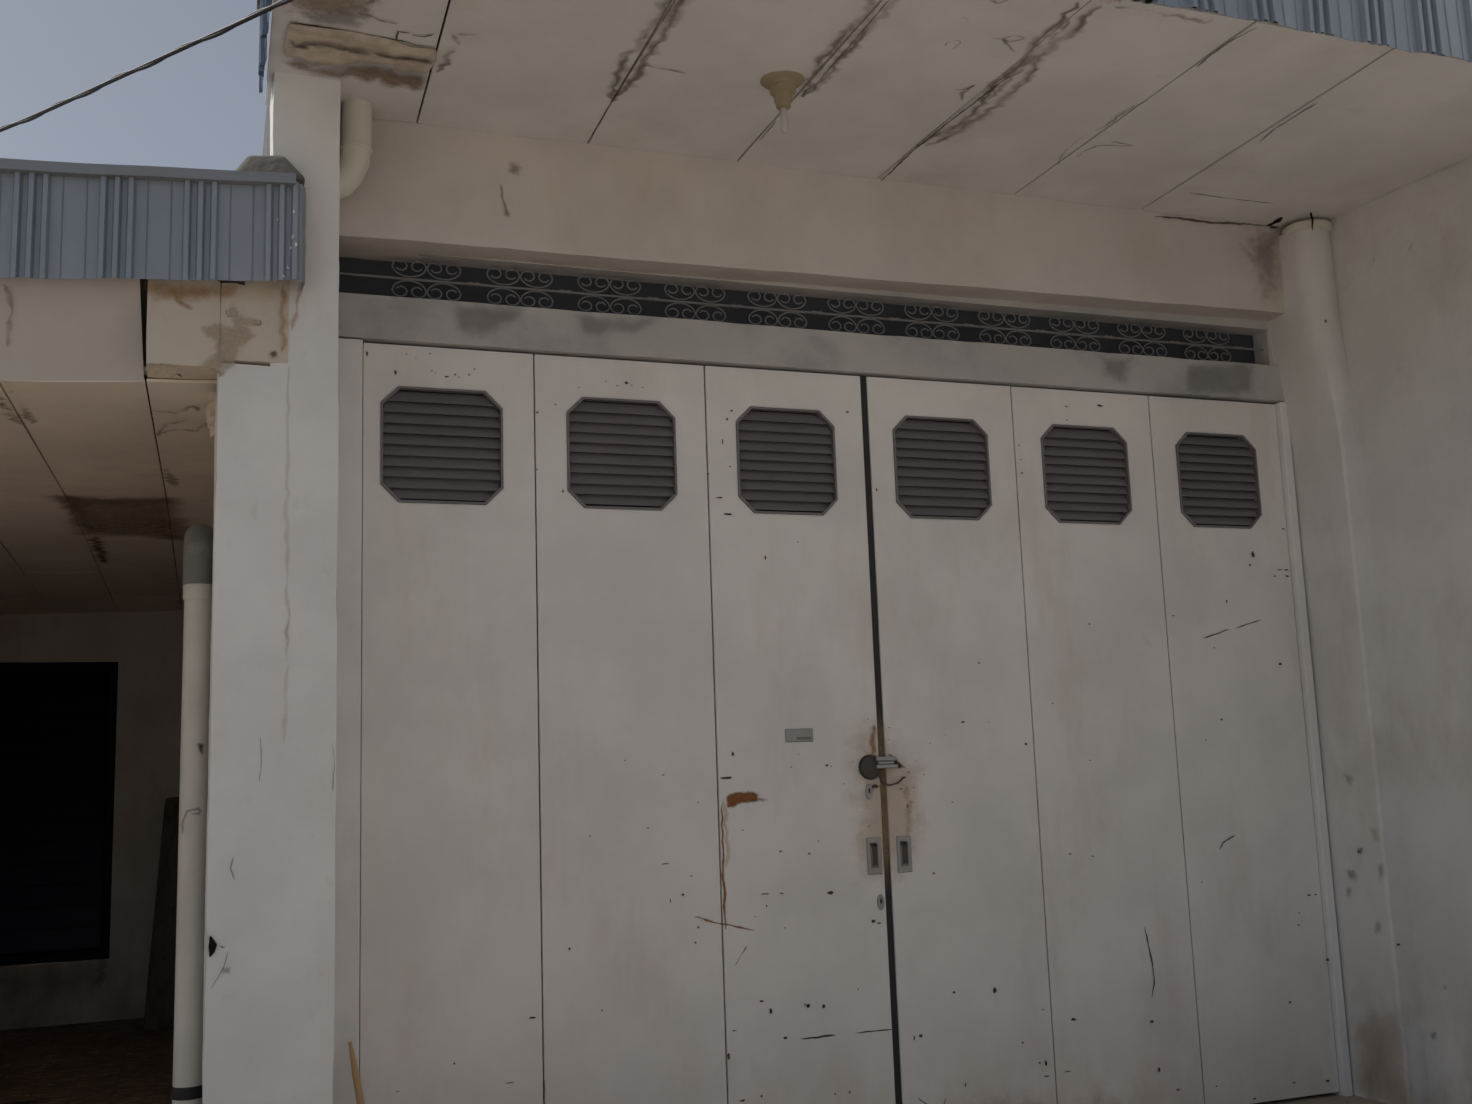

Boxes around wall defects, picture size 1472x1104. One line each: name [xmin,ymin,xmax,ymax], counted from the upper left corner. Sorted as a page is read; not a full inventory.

leakage [590,0,684,141]
leakage [802,0,889,96]
leakage [881,4,1099,181]
leakage [63,497,184,563]
corrosion [697,807,755,931]